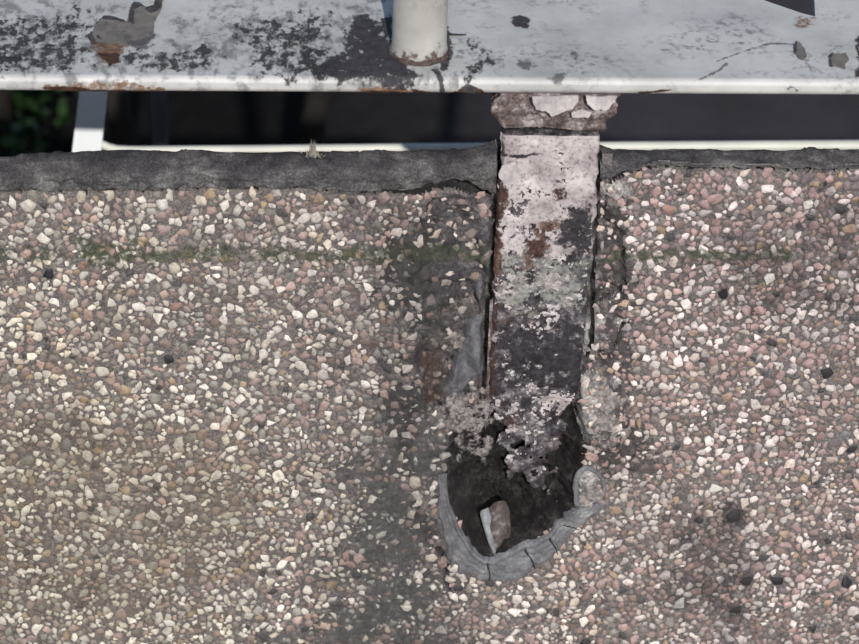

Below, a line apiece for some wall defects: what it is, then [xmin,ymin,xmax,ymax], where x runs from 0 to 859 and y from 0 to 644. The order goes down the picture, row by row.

rust [91,43,125,66]
peeling [87,0,163,49]
rust [393,51,448,65]
peeling [532,95,617,118]
rust [489,176,510,393]
rust [524,220,563,270]
crack [585,149,849,359]
spalling [412,132,628,557]
leakage [589,379,626,450]
leakage [253,320,585,644]